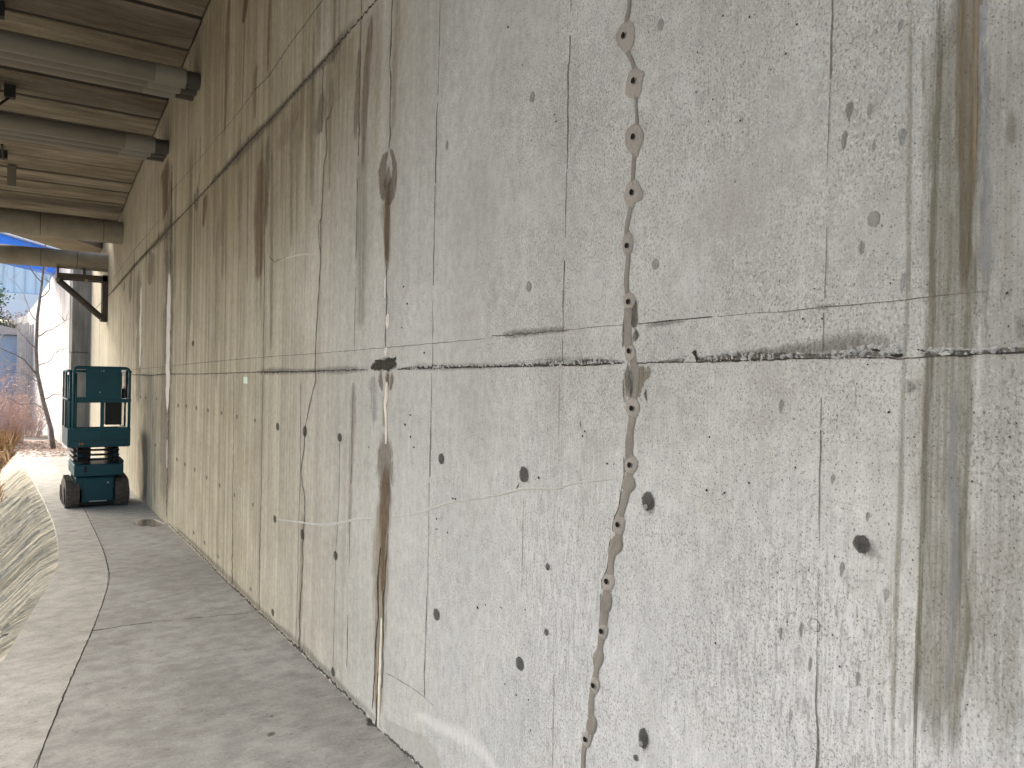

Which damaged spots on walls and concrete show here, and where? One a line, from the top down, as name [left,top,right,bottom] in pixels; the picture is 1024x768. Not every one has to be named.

damp [930,0,988,375]
spalling [370,357,396,371]
crack [96,0,683,768]
spalling [672,350,806,364]
spalling [819,343,1024,365]
damp [914,546,937,713]